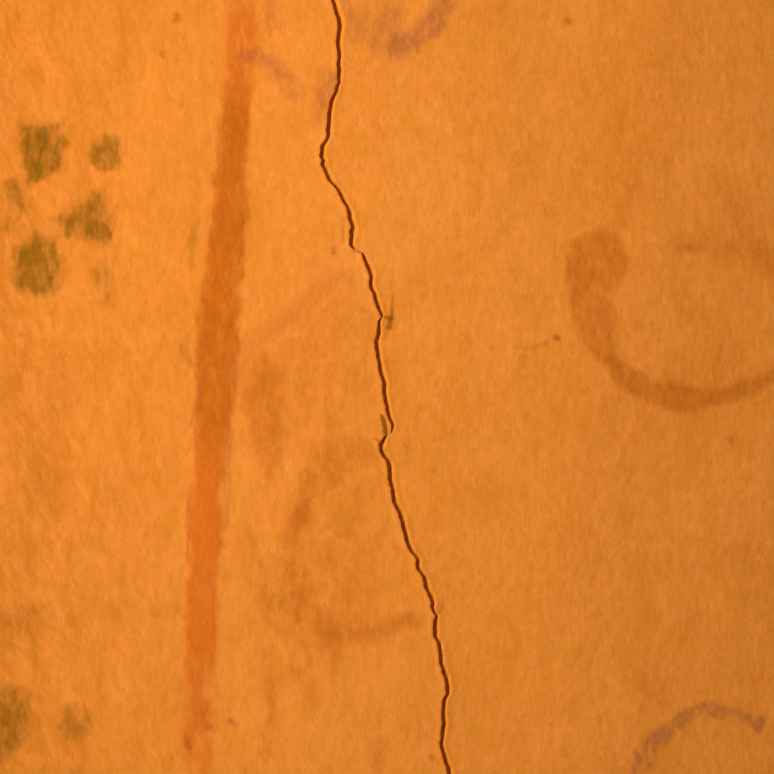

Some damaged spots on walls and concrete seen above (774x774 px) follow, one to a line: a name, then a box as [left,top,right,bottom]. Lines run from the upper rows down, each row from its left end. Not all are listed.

crack [319,0,453,774]